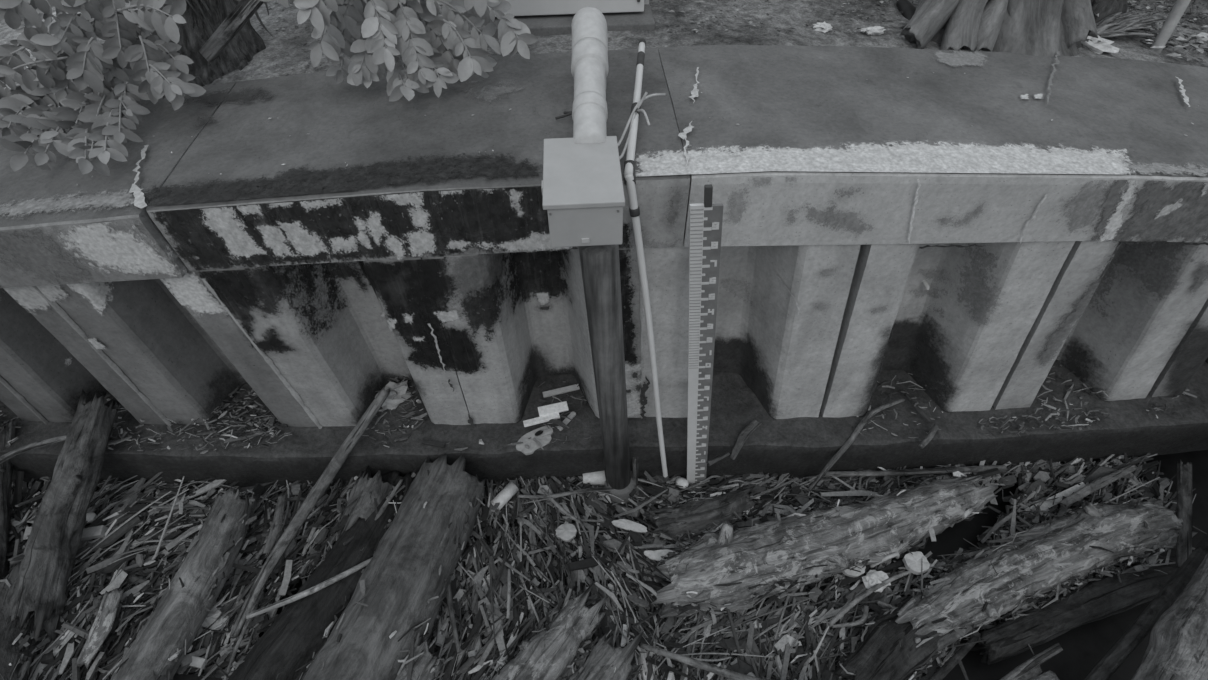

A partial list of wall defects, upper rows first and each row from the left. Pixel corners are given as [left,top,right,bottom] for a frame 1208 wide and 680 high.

leakage [0,229,91,284]
crack [129,145,148,208]
leakage [145,153,577,426]
leakage [859,246,1001,417]
leakage [1037,180,1208,399]